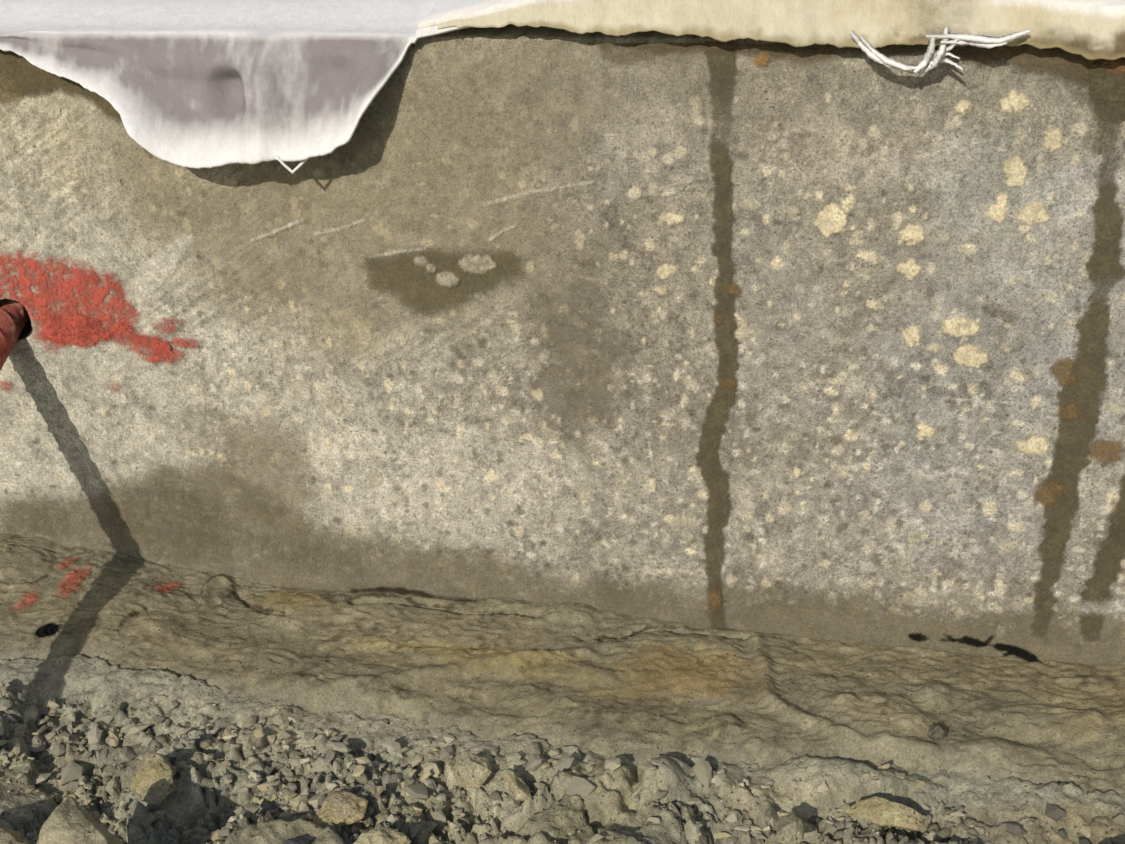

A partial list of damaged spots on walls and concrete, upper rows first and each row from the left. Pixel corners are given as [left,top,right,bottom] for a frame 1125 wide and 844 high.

water stain [0,41,1125,666]
crack [909,634,1041,663]